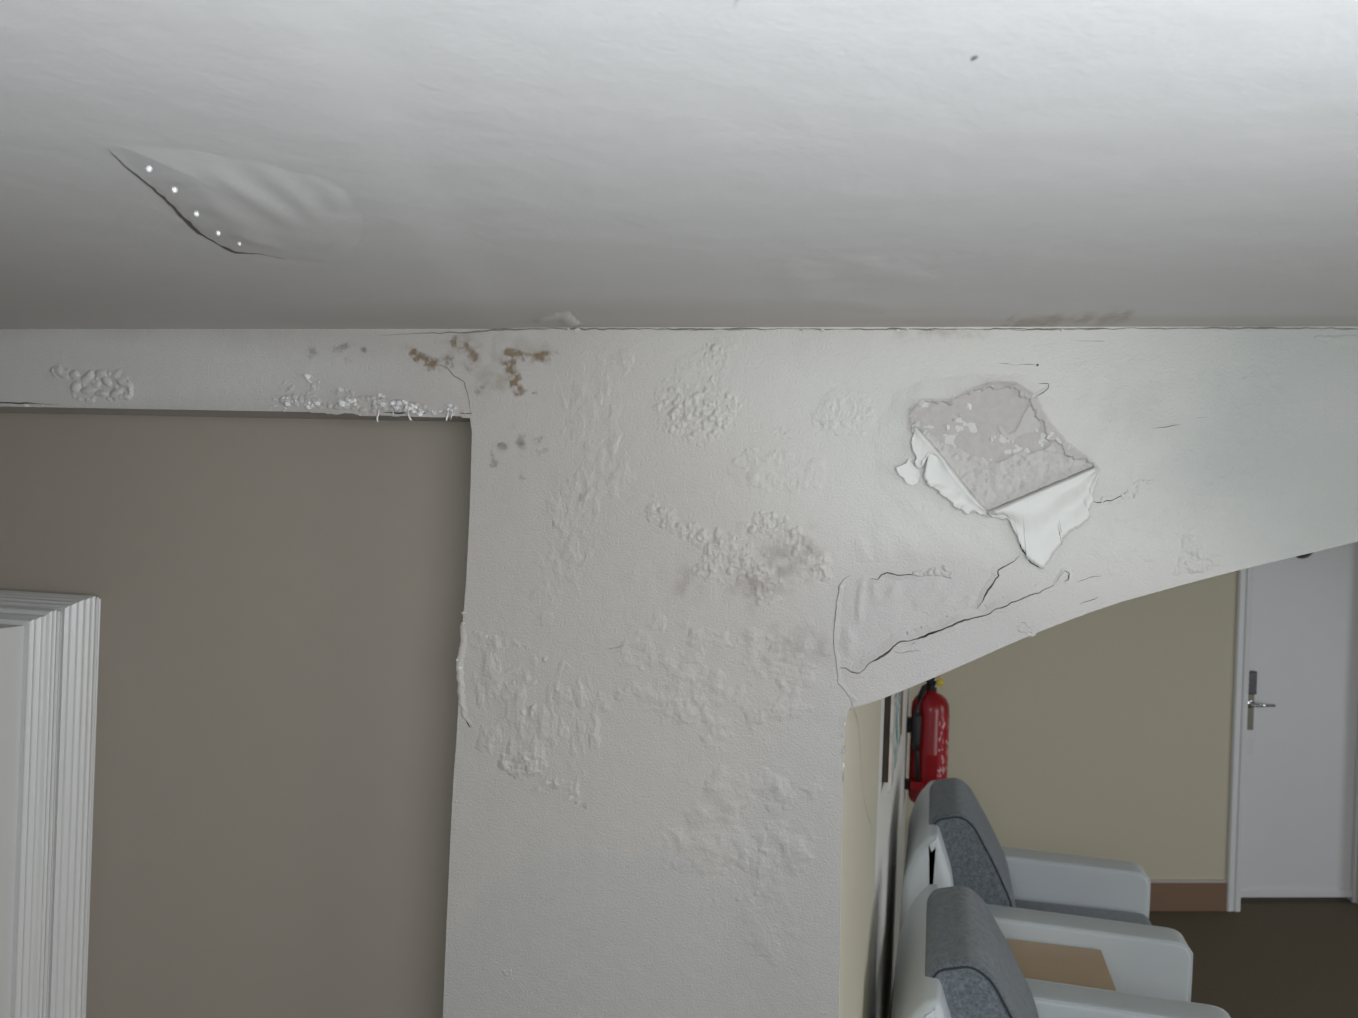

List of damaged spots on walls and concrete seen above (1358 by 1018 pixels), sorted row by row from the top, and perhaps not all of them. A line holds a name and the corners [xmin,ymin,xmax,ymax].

rust [410,349,436,367]
rust [504,349,548,394]
peeling [273,374,471,422]
peeling [869,373,1120,574]